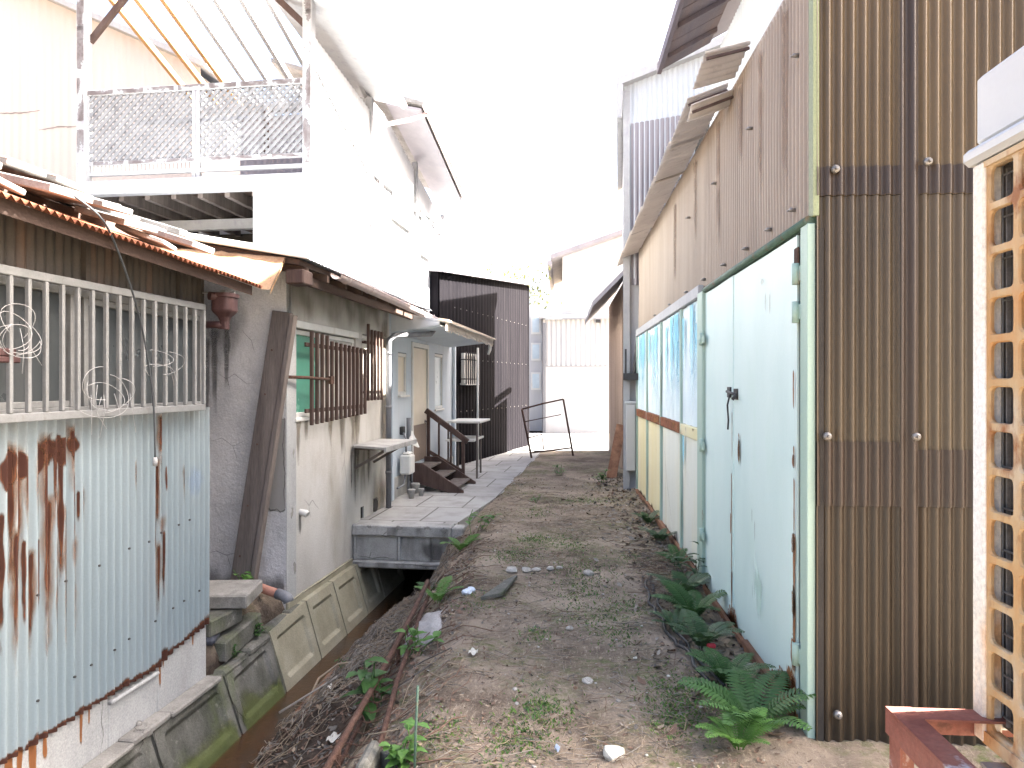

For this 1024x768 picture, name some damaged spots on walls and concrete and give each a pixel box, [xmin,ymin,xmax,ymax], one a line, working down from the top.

damp [200,283,232,406]
corrosion [0,428,80,633]
corrosion [155,462,167,599]
corrosion [771,446,798,719]
corrosion [0,617,209,768]